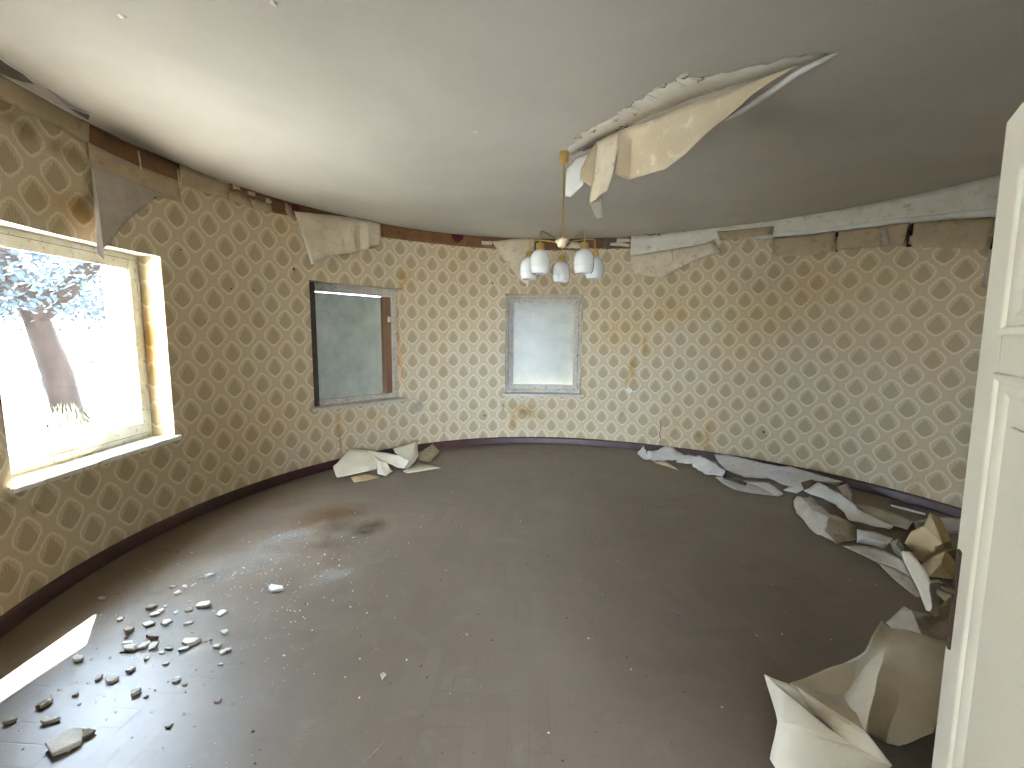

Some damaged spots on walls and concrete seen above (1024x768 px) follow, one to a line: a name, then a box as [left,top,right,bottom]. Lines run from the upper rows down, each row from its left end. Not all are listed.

peeling [88,124,230,261]
peeling [290,203,384,264]
peeling [481,239,535,287]
flaking render [630,174,1001,289]